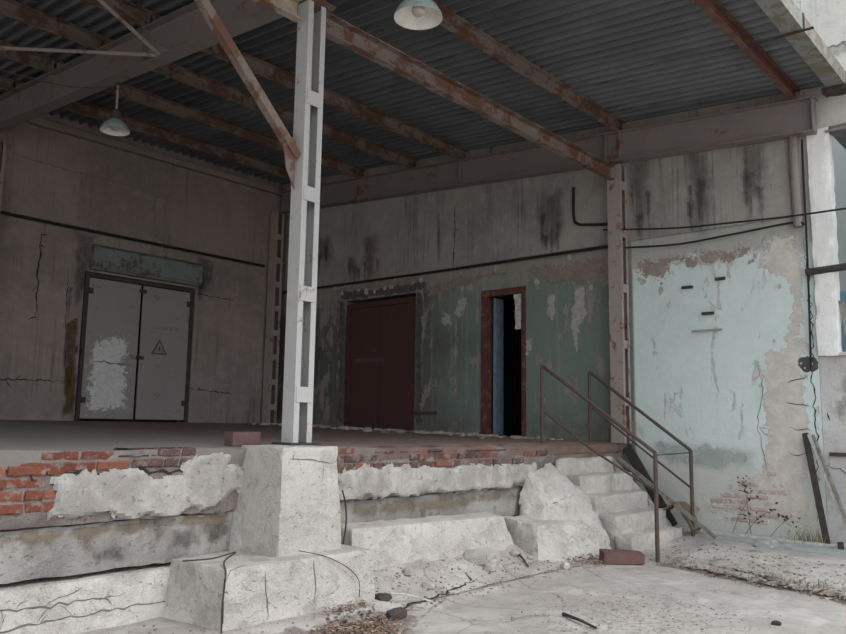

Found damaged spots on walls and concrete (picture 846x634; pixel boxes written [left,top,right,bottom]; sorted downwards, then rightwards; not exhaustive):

crack [28,234,46,320]
peeling [569,284,589,352]
peeling [83,330,132,416]
peeling [636,226,819,533]
crack [757,241,846,518]
peeling [0,447,244,521]
crack [0,588,165,634]